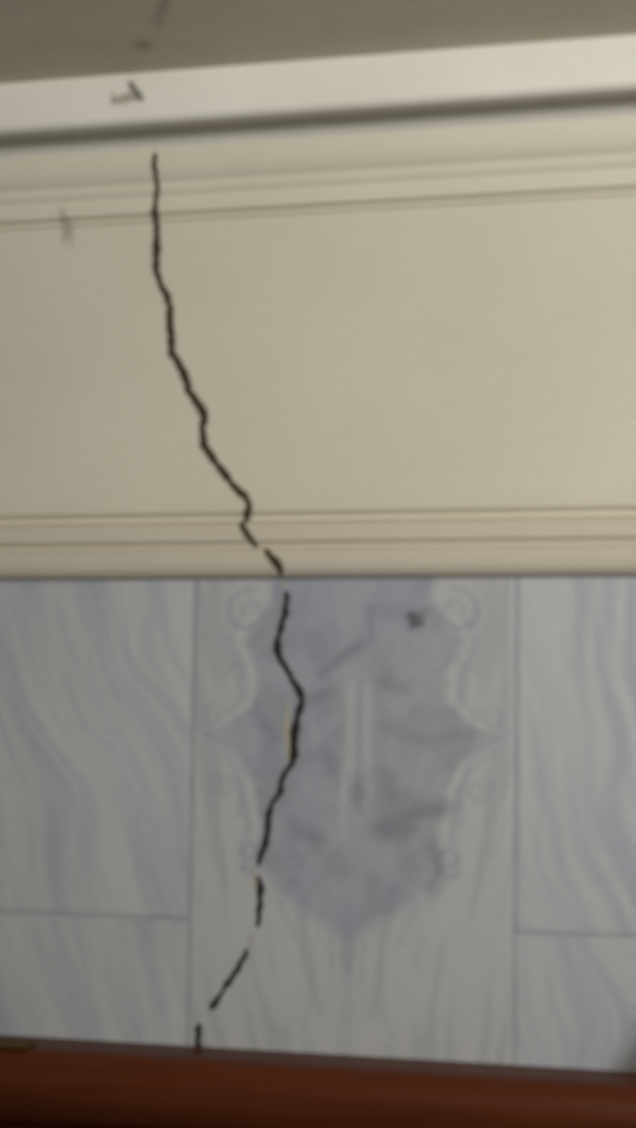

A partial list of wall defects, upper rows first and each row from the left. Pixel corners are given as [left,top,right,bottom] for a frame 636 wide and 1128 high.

crack [151,152,304,1047]